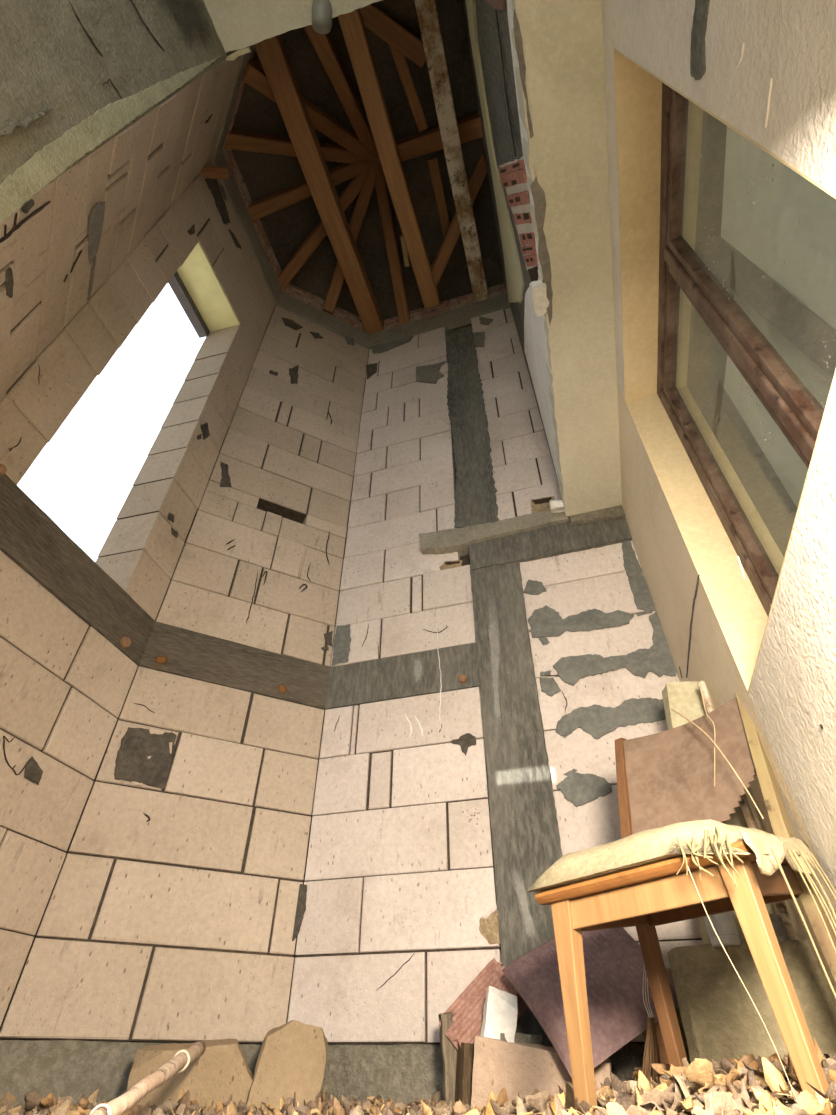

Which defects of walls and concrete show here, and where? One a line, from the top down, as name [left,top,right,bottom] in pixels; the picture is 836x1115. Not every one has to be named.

peeling [149,728,173,753]